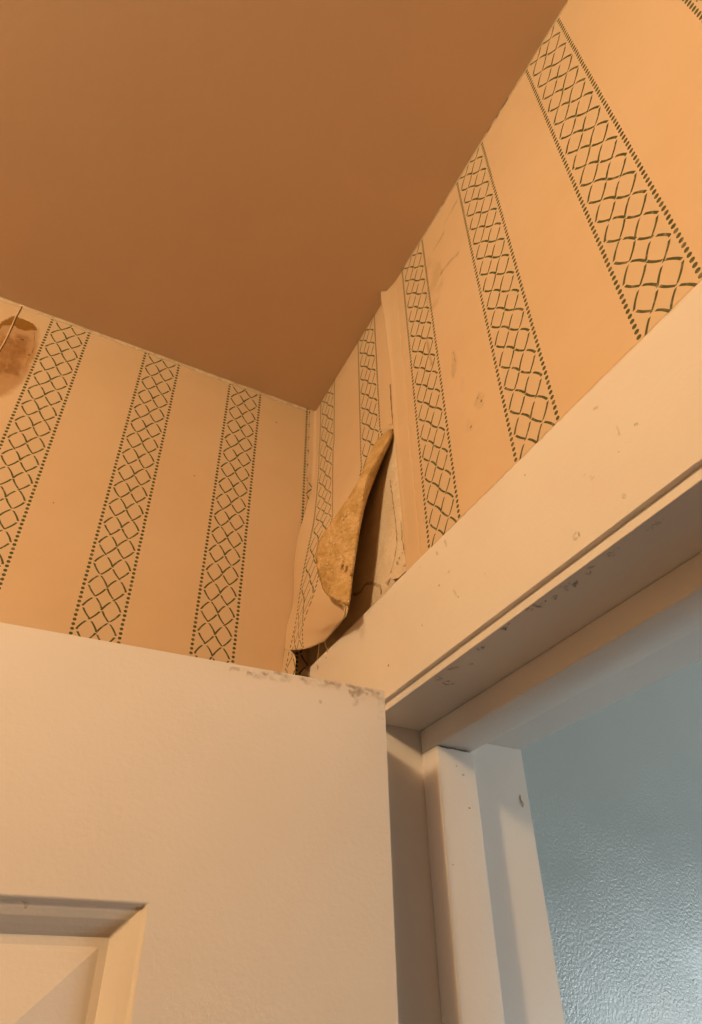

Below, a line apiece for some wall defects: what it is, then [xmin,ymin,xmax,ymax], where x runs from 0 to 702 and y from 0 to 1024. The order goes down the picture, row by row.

damp [0,316,36,340]
flaking render [308,433,406,667]